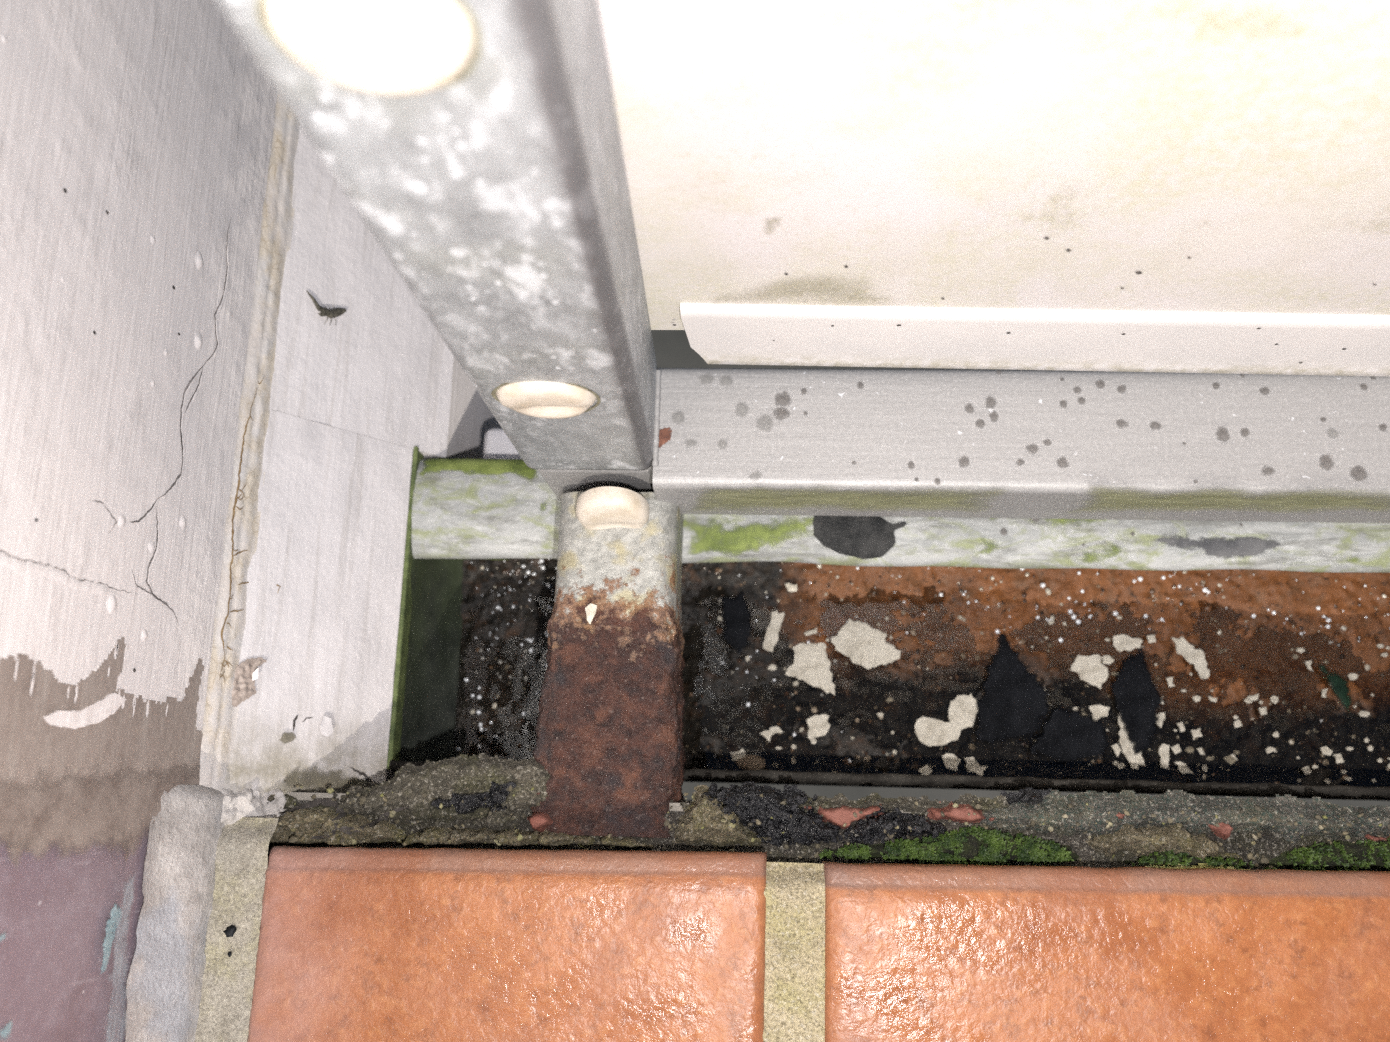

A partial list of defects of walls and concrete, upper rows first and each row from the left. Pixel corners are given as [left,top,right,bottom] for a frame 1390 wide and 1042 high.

crack [0,219,231,622]
peeling [745,610,901,695]
peeling [1293,648,1313,671]
peeling [0,637,204,791]
peeling [760,714,830,750]
peeling [915,694,988,776]
peeling [1070,634,1239,771]
peeling [1233,696,1278,720]